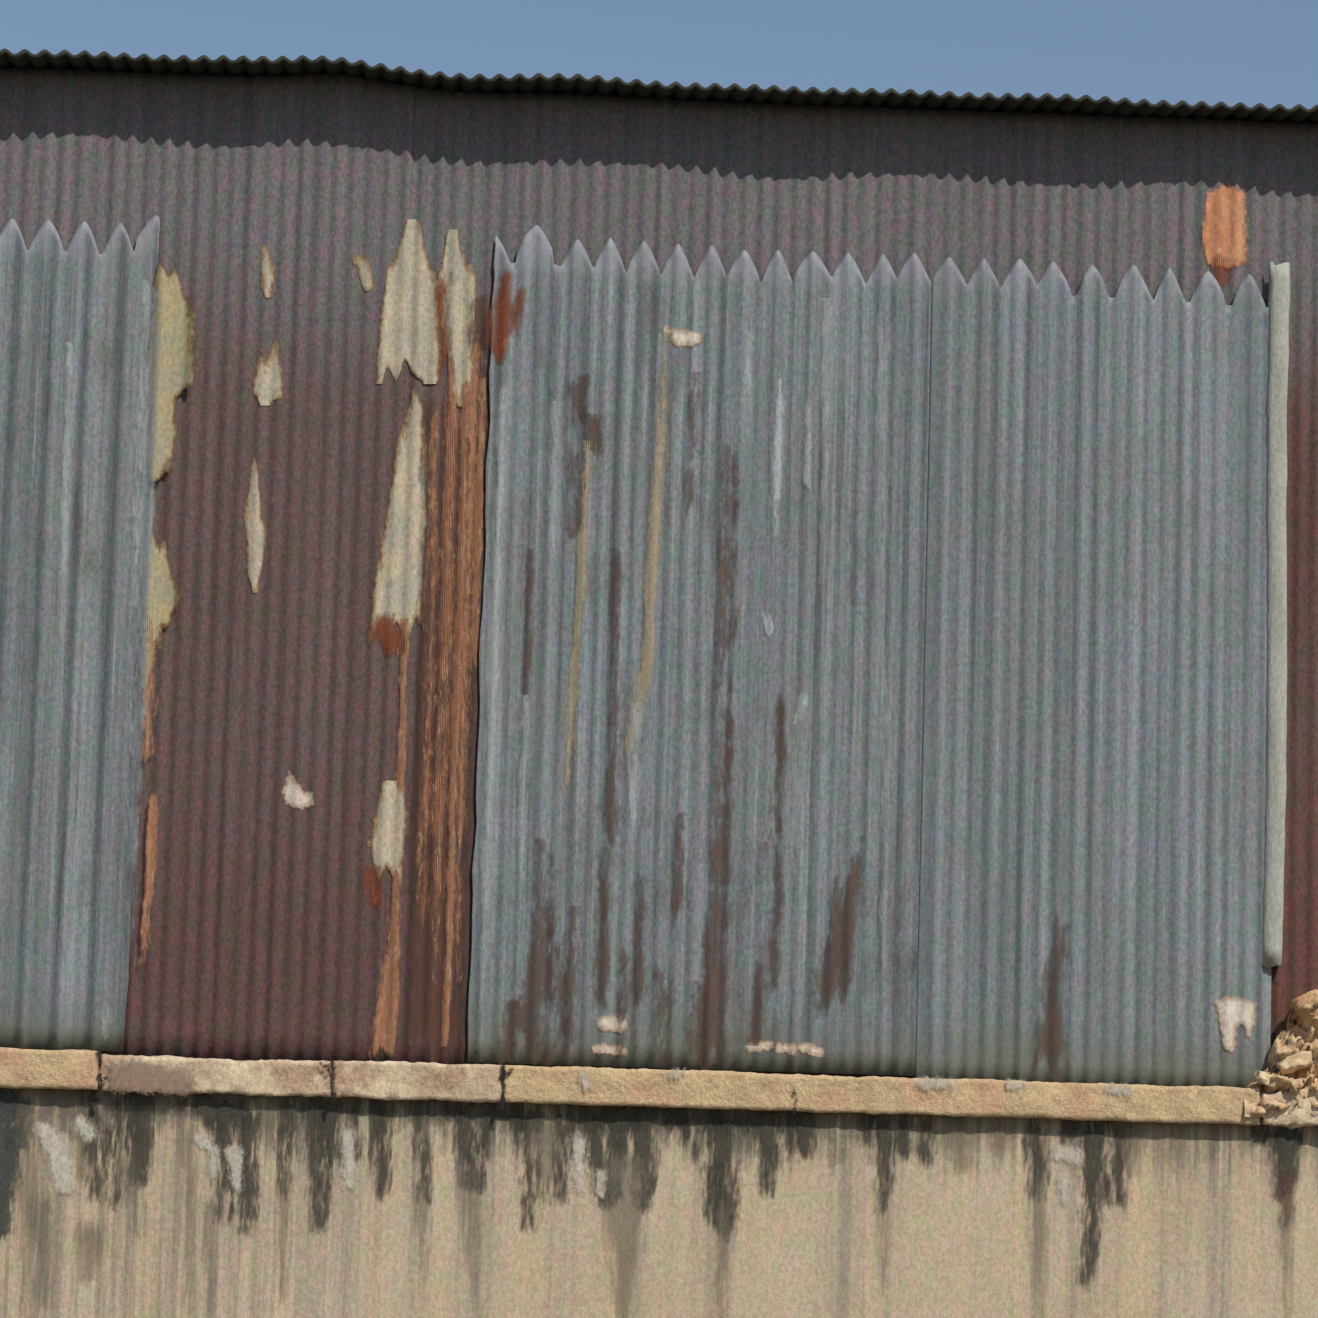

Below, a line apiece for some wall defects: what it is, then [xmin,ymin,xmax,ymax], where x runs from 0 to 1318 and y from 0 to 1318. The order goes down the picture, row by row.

corrosion [1202,184,1249,286]
peeling [148,262,196,482]
peeling [353,219,478,643]
corrosion [365,271,524,1056]
corrosion [606,333,671,842]
peeling [367,781,408,885]
corrosion [690,711,734,1070]
spalling [1244,989,1318,1117]
leakage [0,1088,156,1239]
leakage [177,1093,261,1234]
leakage [273,1098,817,1237]
leakage [1022,1120,1132,1284]